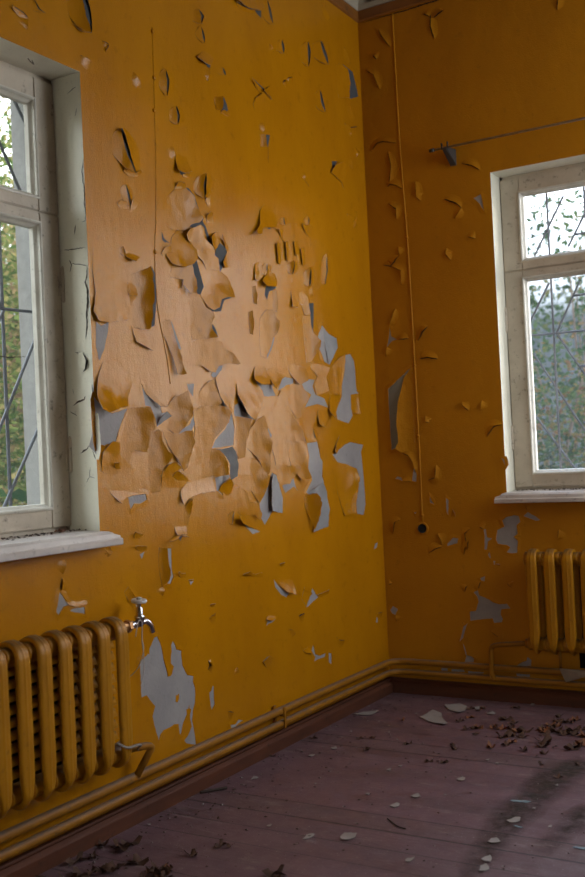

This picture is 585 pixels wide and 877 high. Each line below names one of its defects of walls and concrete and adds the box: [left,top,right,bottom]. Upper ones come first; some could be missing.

peeling [112,128,142,213]
peeling [75,146,367,596]
flaking render [479,505,544,557]
flaking render [52,578,88,621]
peeling [243,571,329,612]
flaking render [466,573,514,627]
flaking render [136,631,217,749]